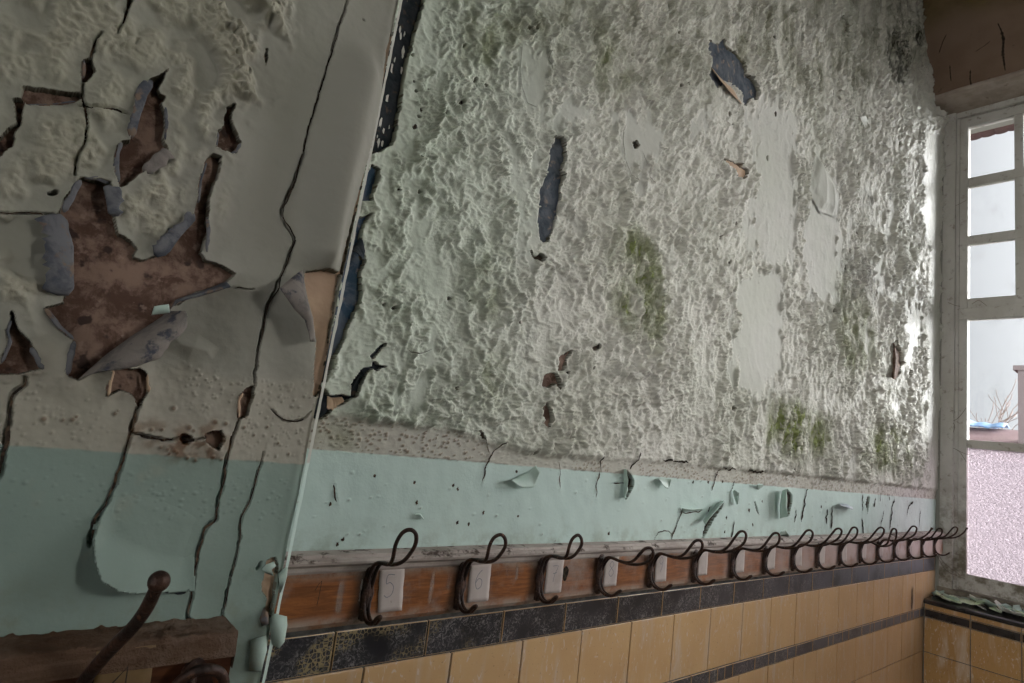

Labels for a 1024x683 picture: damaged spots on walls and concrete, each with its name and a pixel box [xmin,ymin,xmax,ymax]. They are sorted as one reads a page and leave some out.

peeling [708,40,756,105]
peeling [0,313,44,374]
peeling [35,79,241,407]
crack [237,0,347,386]
peeling [280,167,385,419]
peeling [537,138,564,242]
mould [626,235,665,336]
crack [0,378,27,473]
crack [91,407,195,543]
crack [187,419,264,619]
mould [768,404,831,456]
mould [875,428,912,468]